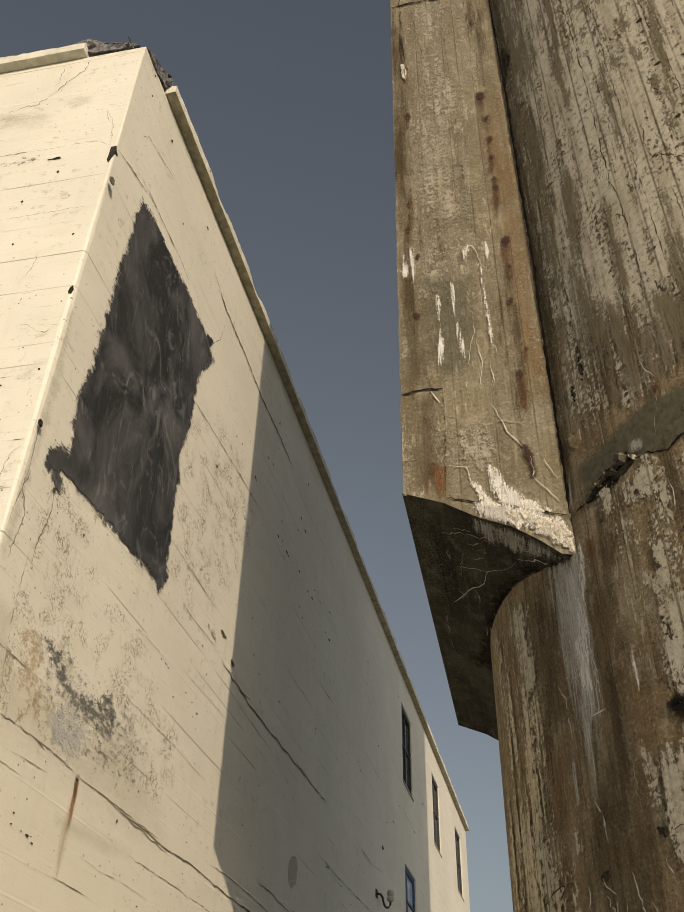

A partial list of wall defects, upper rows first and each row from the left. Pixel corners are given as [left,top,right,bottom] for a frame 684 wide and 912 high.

crack [214,275,292,465]
leakage [436,295,444,365]
corrosion [487,136,498,210]
corrosion [501,235,512,278]
peeling [393,0,684,449]
leakage [498,0,684,523]
corrosion [68,778,79,823]
crack [0,403,289,912]
crack [224,665,326,801]
peeling [490,603,589,912]
leakage [470,464,640,827]
peeling [637,735,684,863]